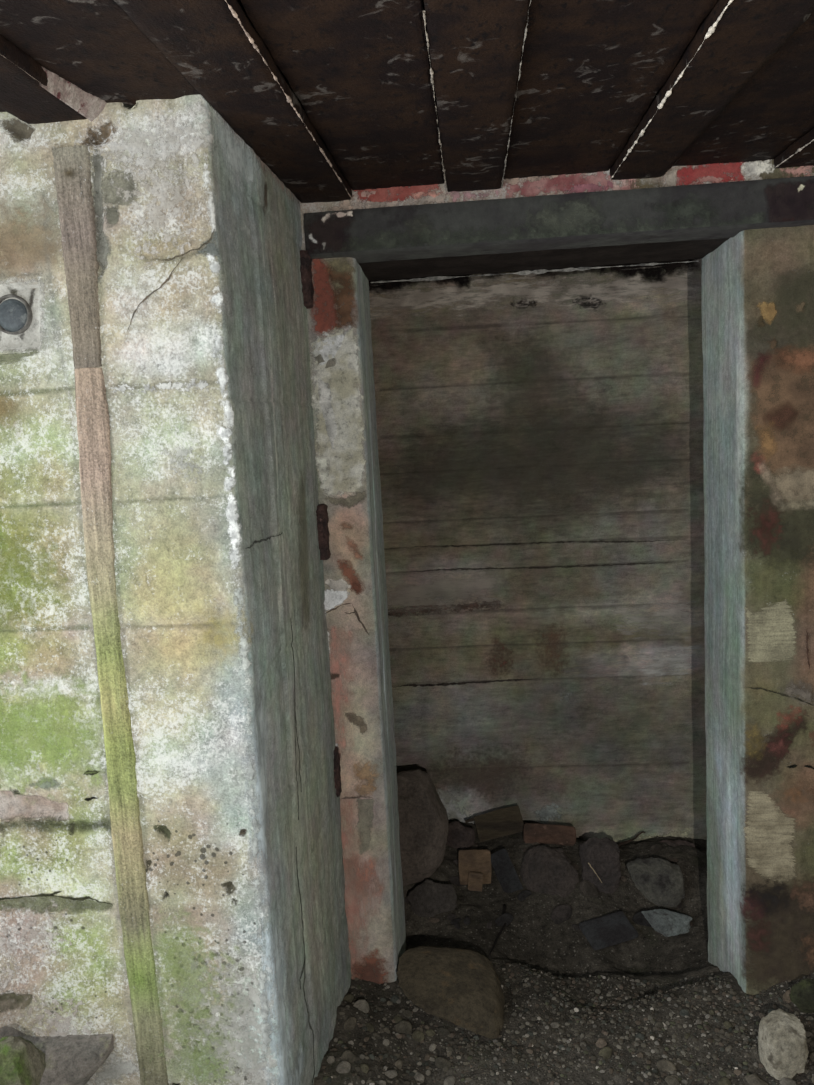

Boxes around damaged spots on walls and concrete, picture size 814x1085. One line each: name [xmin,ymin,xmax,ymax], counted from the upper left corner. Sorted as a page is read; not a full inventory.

crack [127,229,215,331]
rust [337,523,362,593]
crack [0,891,110,904]